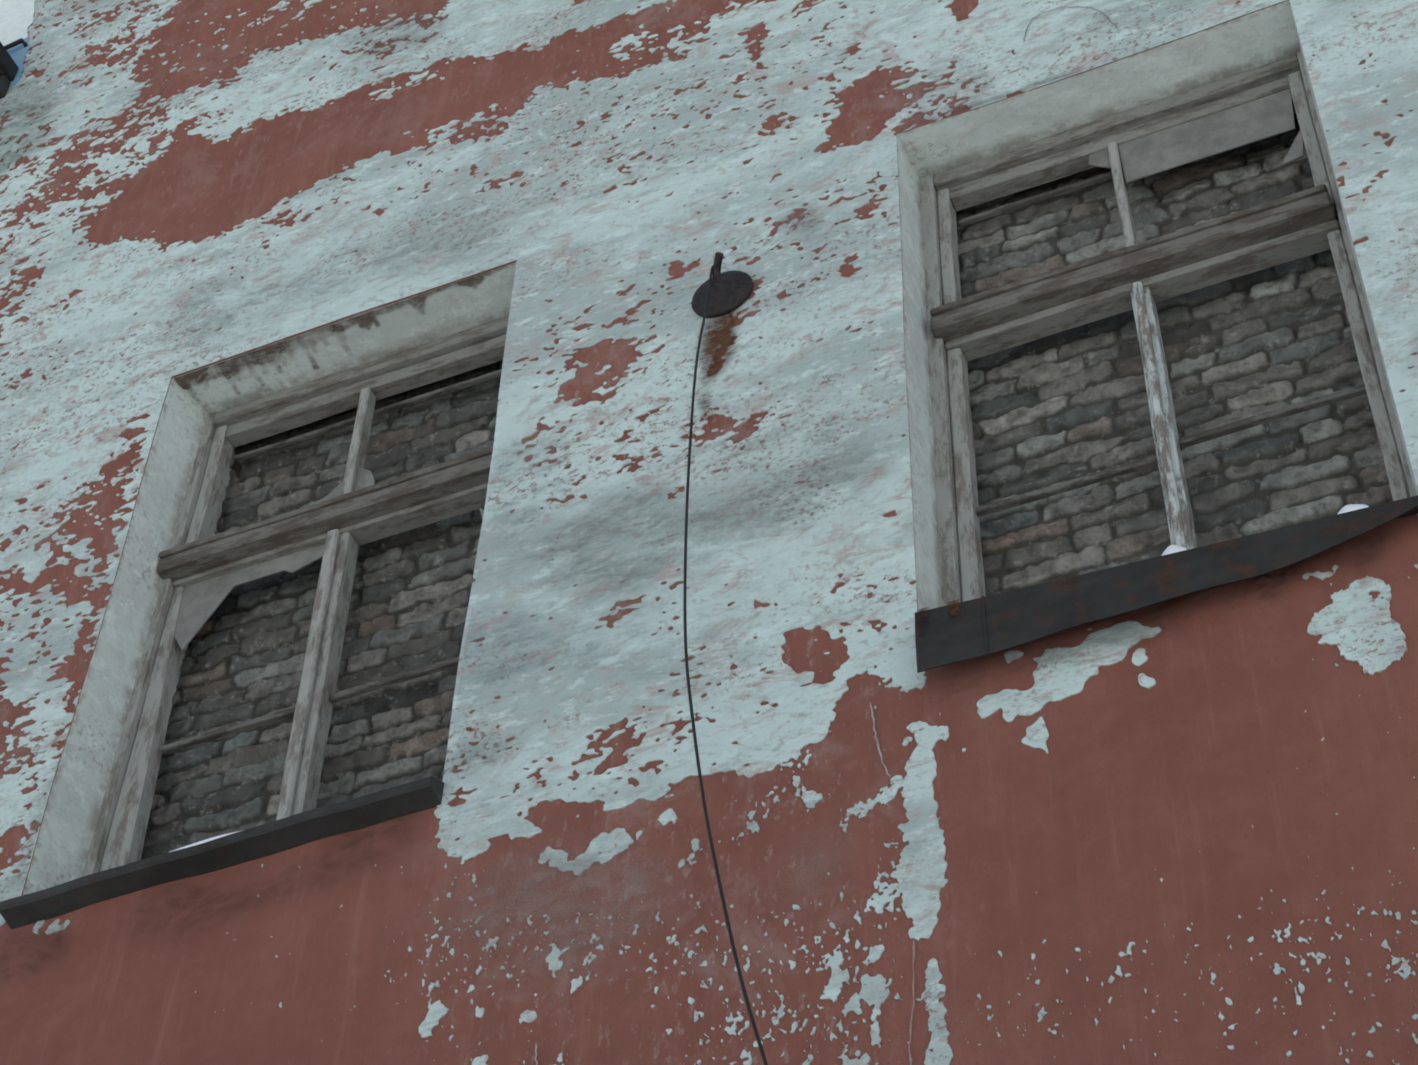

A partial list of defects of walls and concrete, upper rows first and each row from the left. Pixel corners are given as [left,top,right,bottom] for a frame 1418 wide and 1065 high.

peeling [187,9,250,50]
peeling [239,0,322,37]
peeling [1302,565,1408,675]
peeling [977,621,1162,754]
peeling [538,828,643,876]
peeling [619,721,954,1065]
peeling [418,870,613,1048]
peeling [977,939,1159,1041]
peeling [1164,876,1418,1065]
peeling [471,1042,489,1065]